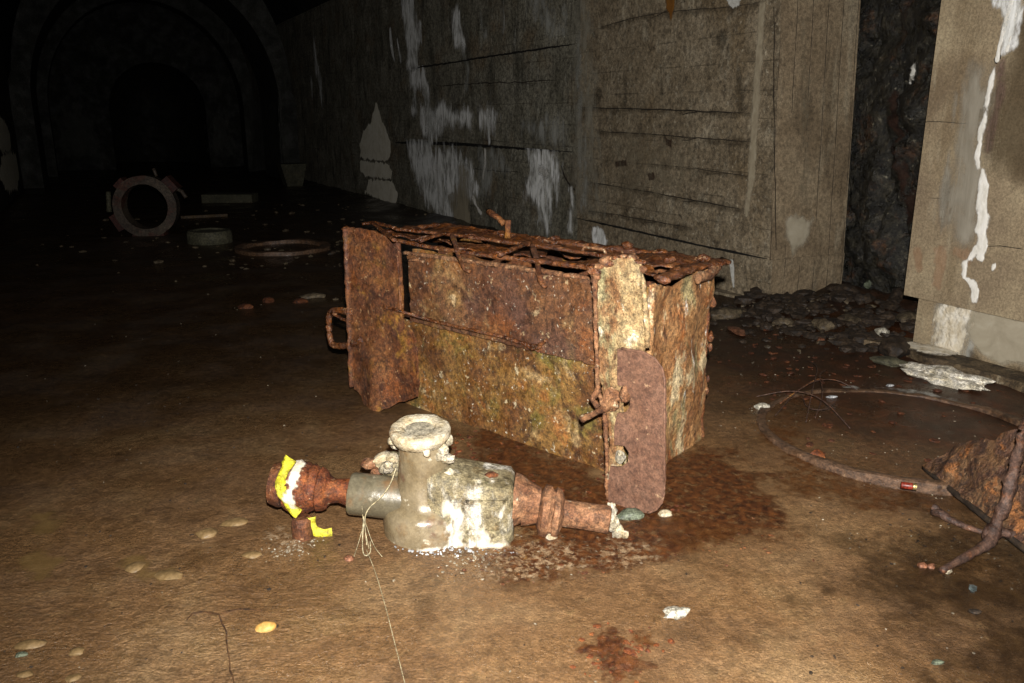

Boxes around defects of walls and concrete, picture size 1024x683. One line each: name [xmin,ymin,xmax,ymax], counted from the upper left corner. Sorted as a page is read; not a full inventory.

spalling [360,103,398,203]
water stain [389,0,504,217]
water stain [526,0,598,234]
water stain [907,0,1024,365]
rust [570,622,675,683]